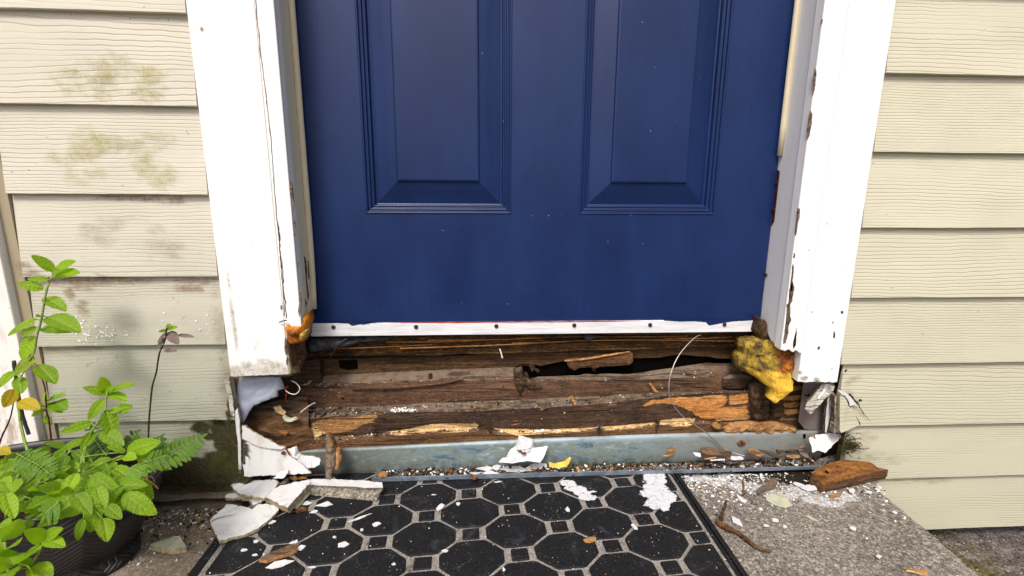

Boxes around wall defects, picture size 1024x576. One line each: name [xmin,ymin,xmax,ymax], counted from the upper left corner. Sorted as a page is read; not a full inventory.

peeling [783,253,797,354]
peeling [309,414,378,440]
peeling [643,393,808,433]
spalling [821,432,840,457]